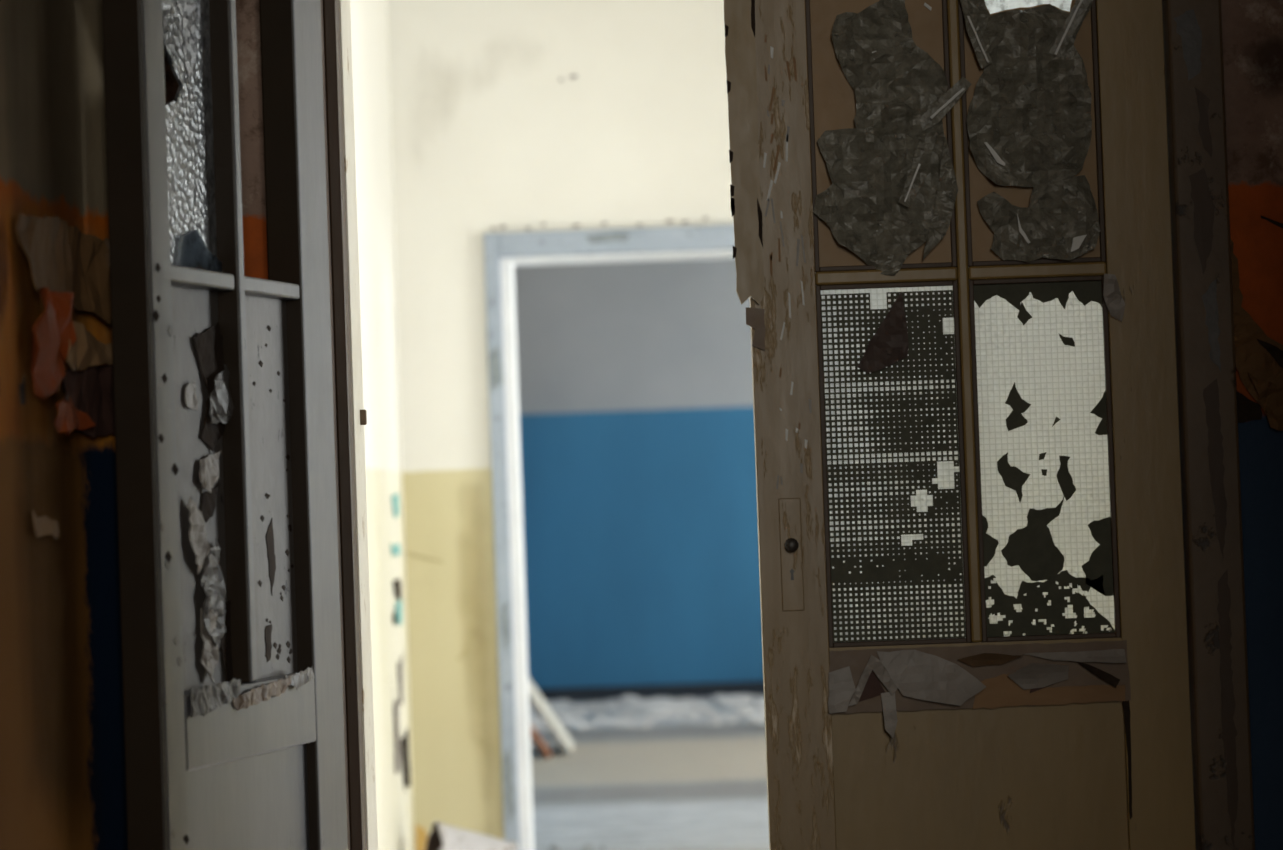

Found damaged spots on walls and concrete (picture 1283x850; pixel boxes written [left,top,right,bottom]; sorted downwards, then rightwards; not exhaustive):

peeling [15,214,115,438]
peeling [32,510,59,540]